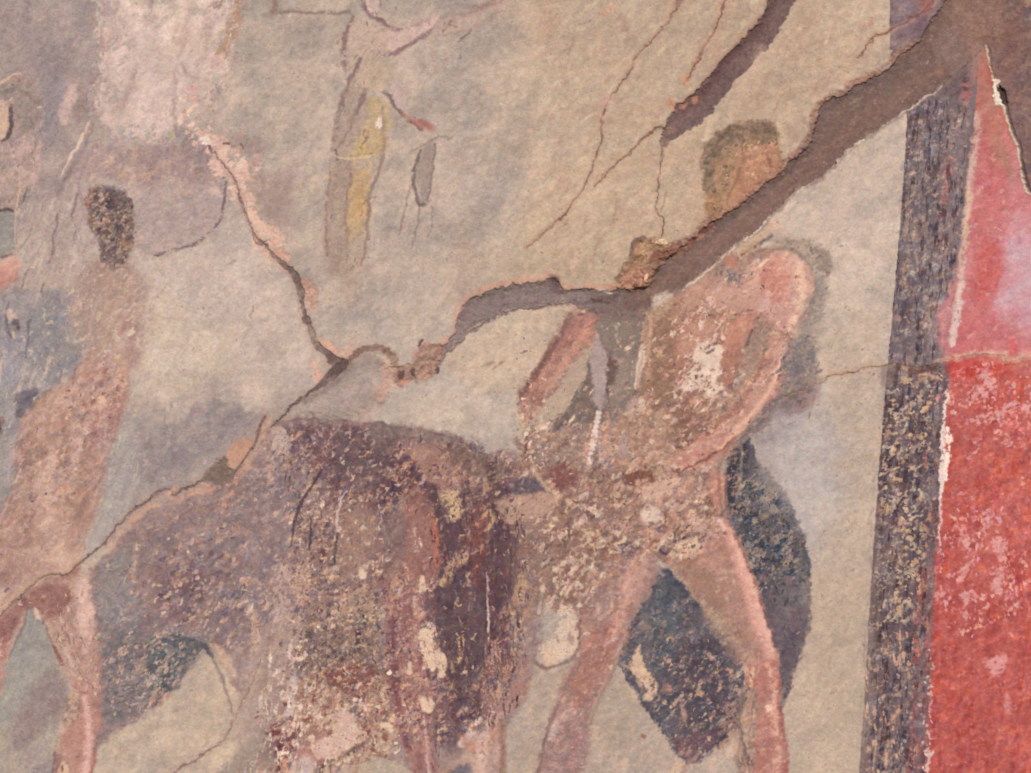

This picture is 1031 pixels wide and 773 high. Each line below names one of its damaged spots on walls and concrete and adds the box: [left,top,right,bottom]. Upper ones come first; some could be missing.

crack [442,0,1031,356]
crack [196,128,399,477]
spalling [615,223,716,291]
spalling [389,344,444,388]
crack [785,353,1031,397]
crack [0,481,202,618]
crack [176,660,261,773]